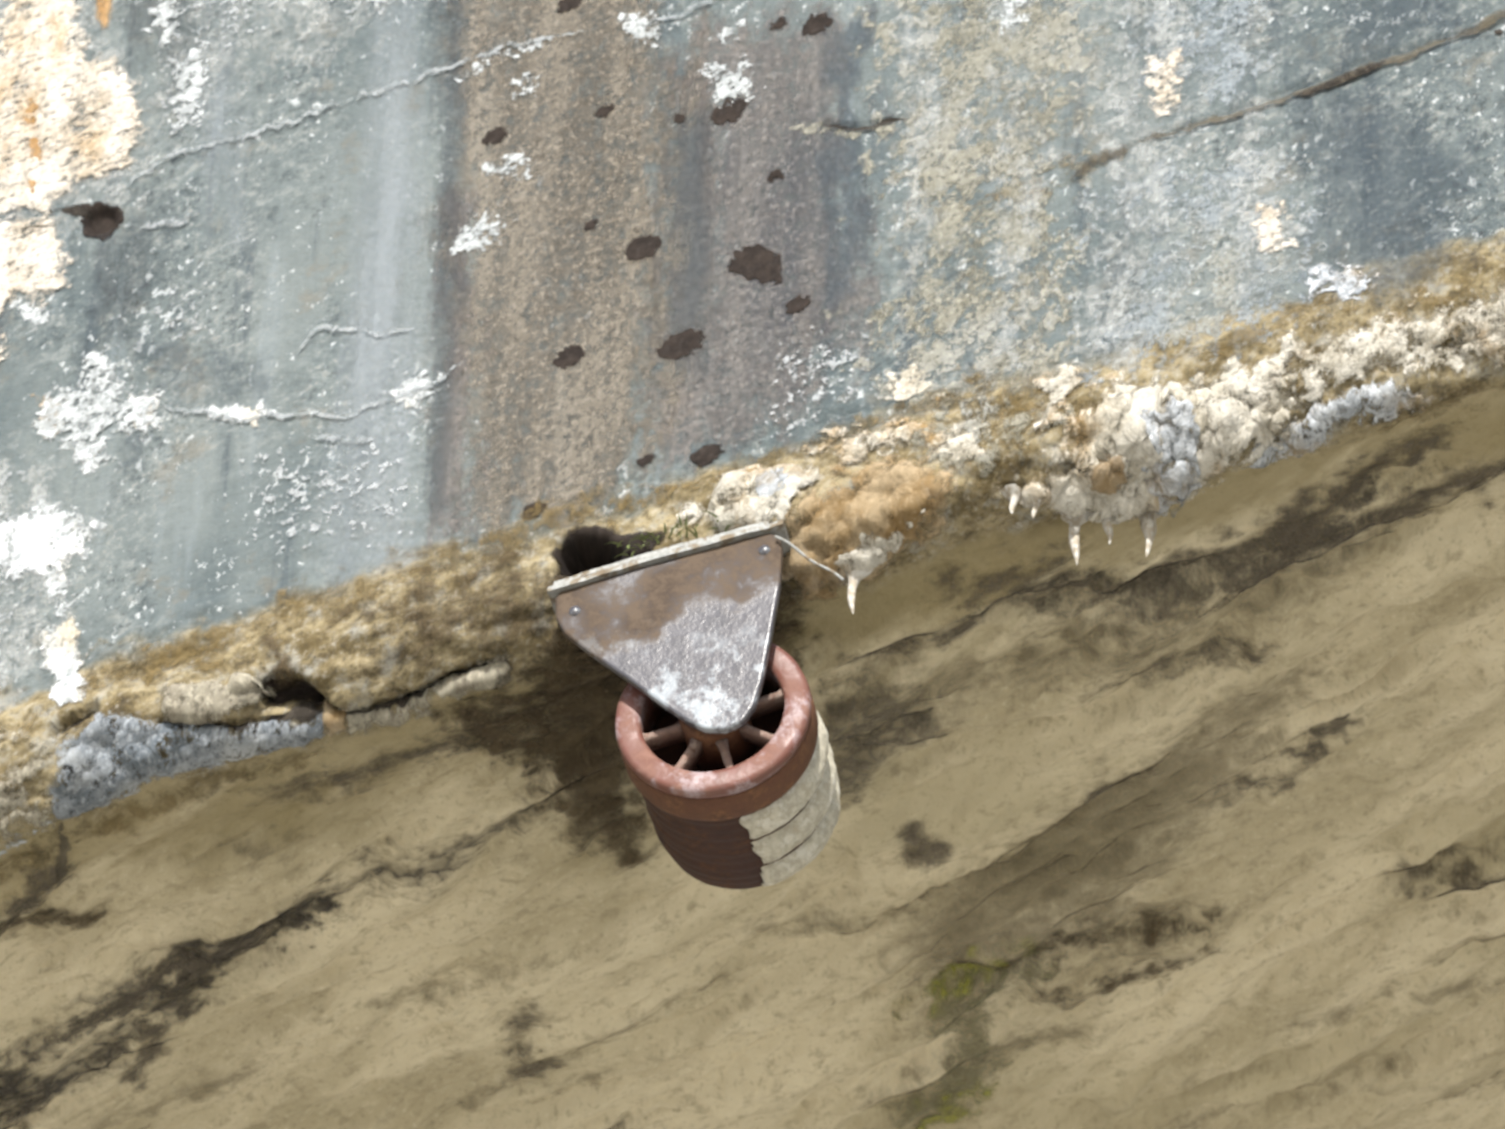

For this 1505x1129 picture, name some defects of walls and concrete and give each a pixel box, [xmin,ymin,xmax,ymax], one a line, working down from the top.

damp [0,0,146,333]
corrosion [97,0,111,27]
crack [1066,10,1505,177]
damp [32,344,165,474]
damp [155,282,207,338]
damp [234,0,1505,664]
spalling [0,636,513,856]
damp [1101,636,1265,691]
damp [0,549,656,1129]
damp [898,822,950,867]
damp [920,679,1358,1010]
damp [1385,846,1505,899]